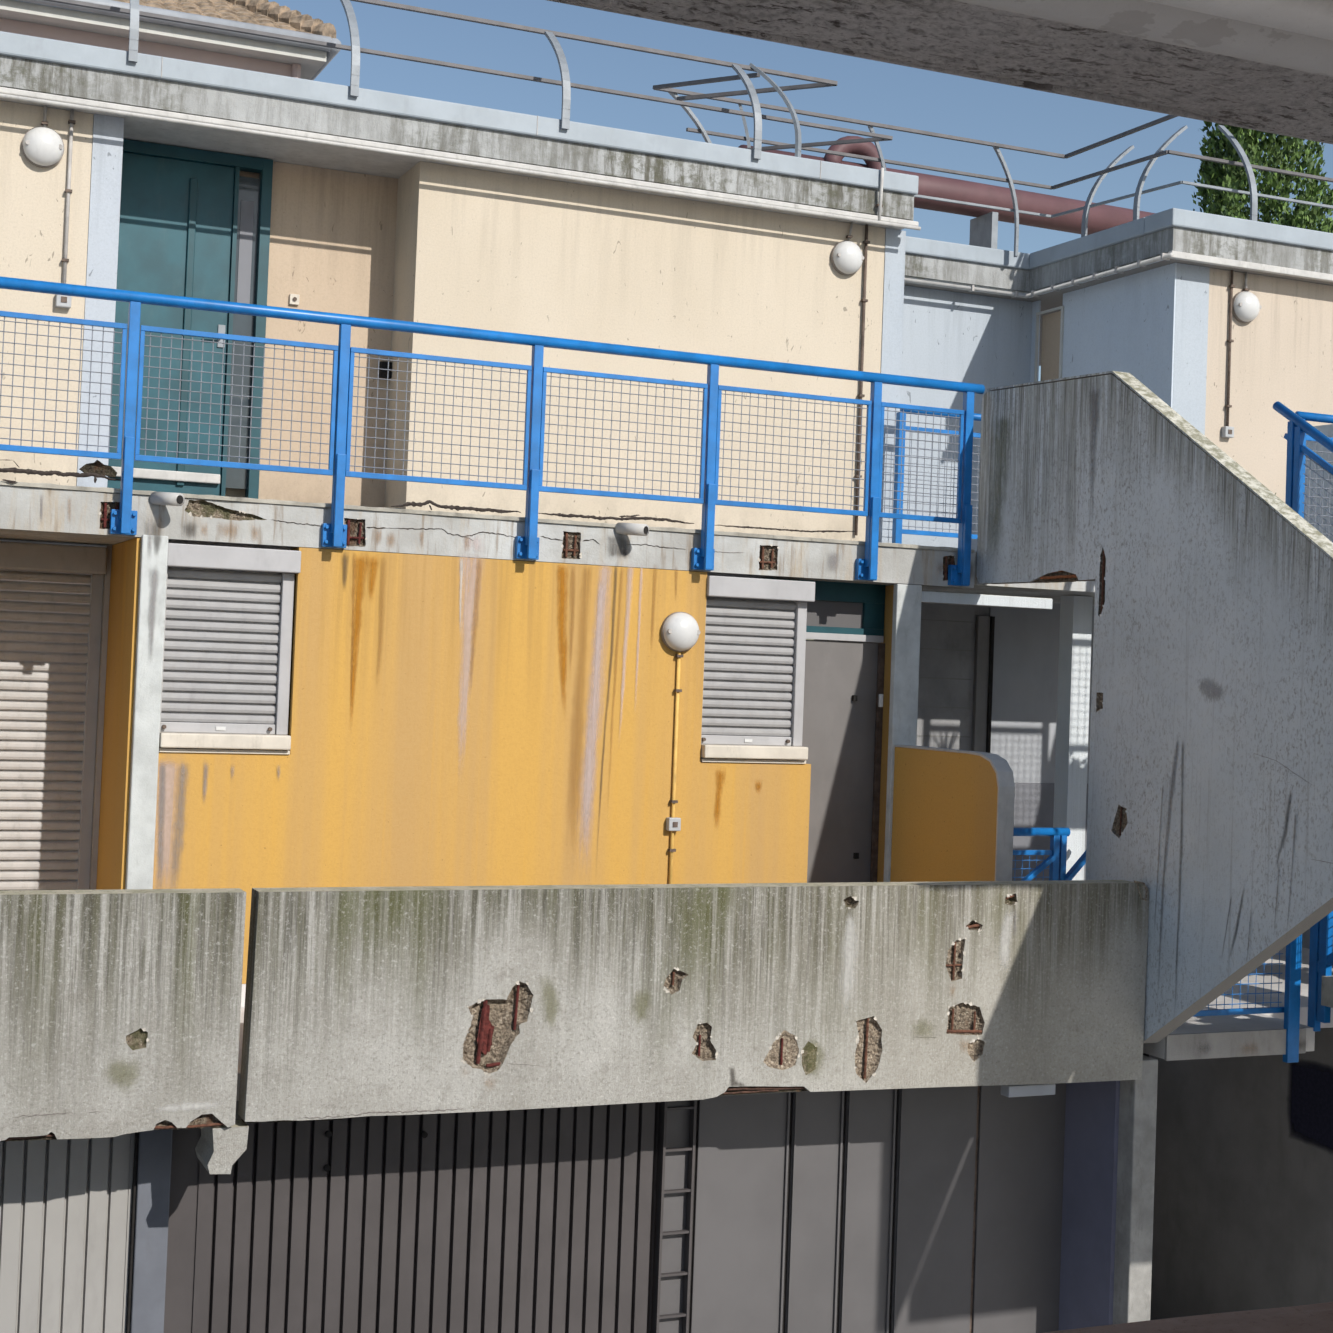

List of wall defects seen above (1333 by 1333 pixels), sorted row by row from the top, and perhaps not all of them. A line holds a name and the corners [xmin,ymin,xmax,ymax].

rust [344,518,377,701]
rust [558,531,582,691]
water stain [844,920,854,994]
spalling [946,920,982,981]
water stain [1002,916,1016,958]
spalling [460,981,533,1076]
spalling [692,1023,718,1061]
spalling [719,1030,819,1096]
spalling [854,1016,882,1082]
spalling [946,1001,986,1062]
spalling [154,1114,226,1130]